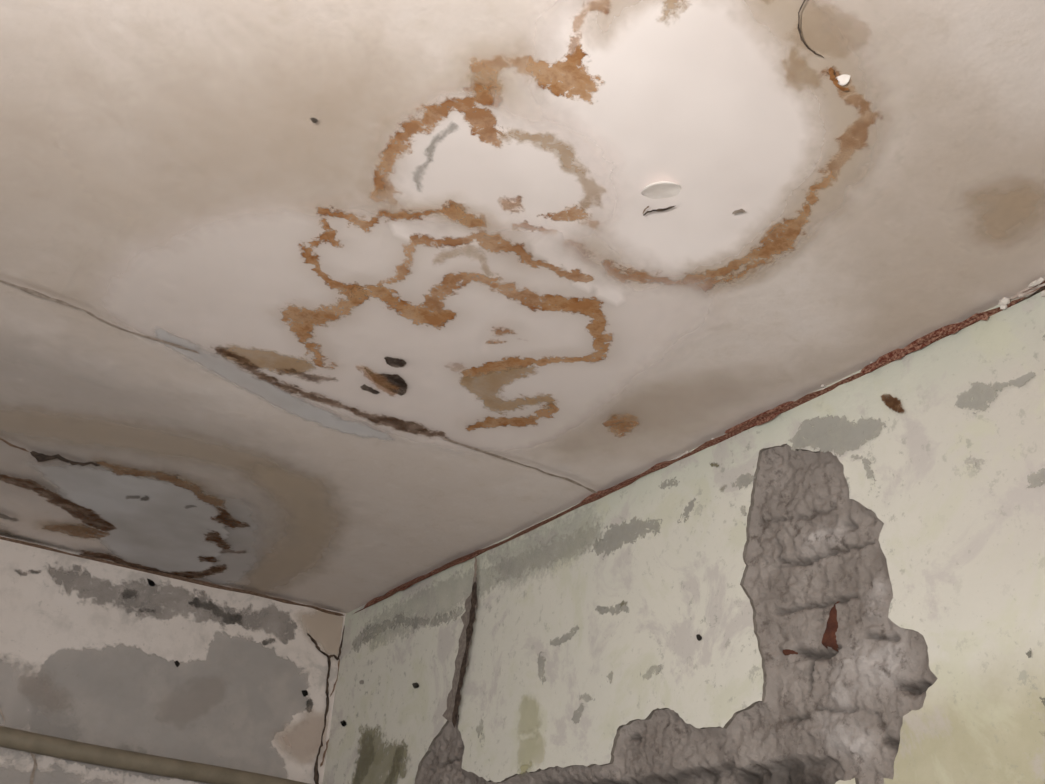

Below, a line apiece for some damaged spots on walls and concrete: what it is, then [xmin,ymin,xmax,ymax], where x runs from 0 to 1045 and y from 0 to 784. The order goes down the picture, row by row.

crack [797,0,849,91]
damp [215,0,875,439]
crack [643,206,675,216]
peeling [357,357,407,396]
damp [0,461,250,578]
crack [0,277,1045,784]
peeling [1028,468,1045,488]
flaking render [417,415,938,784]
peeling [16,565,313,779]
peeling [0,759,210,784]